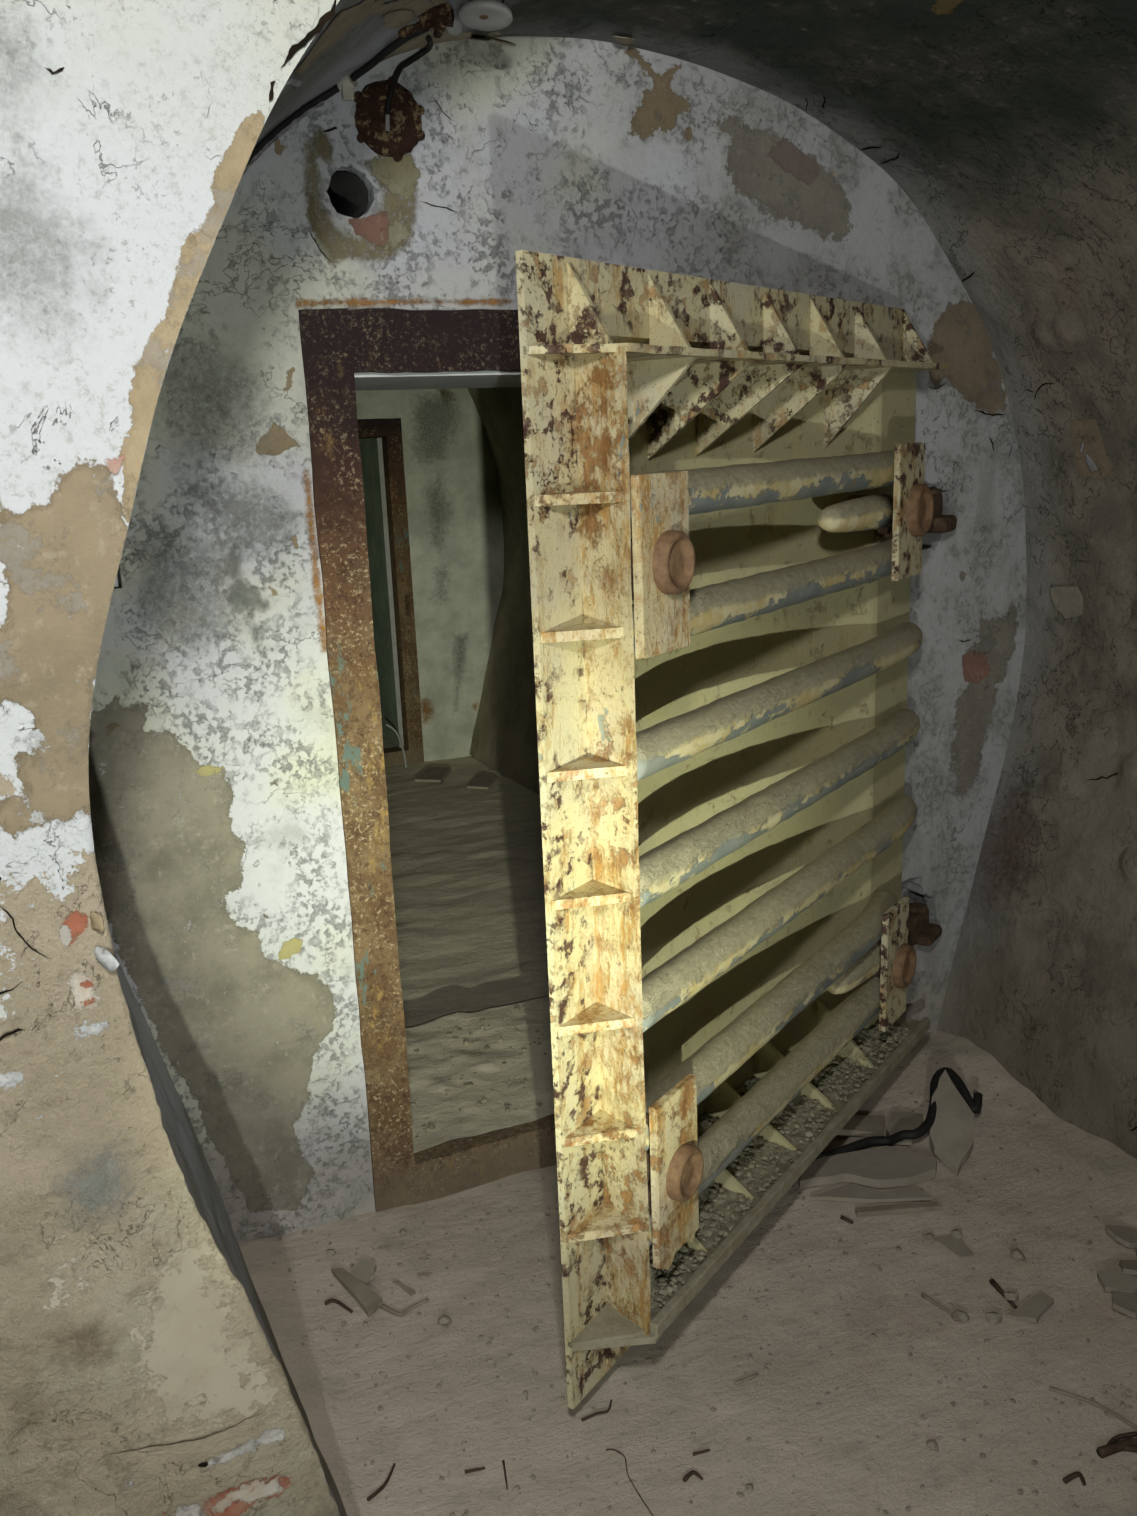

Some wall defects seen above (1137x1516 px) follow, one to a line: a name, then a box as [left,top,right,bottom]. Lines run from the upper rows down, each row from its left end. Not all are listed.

peeling [611,36,694,142]
peeling [305,127,424,268]
peeling [712,114,853,249]
rust [296,298,511,307]
peeling [927,299,1007,416]
rust [304,471,327,651]
peeling [0,110,337,1213]
crack [0,877,50,994]
crack [0,1029,23,1041]
flaking render [160,1475,292,1516]